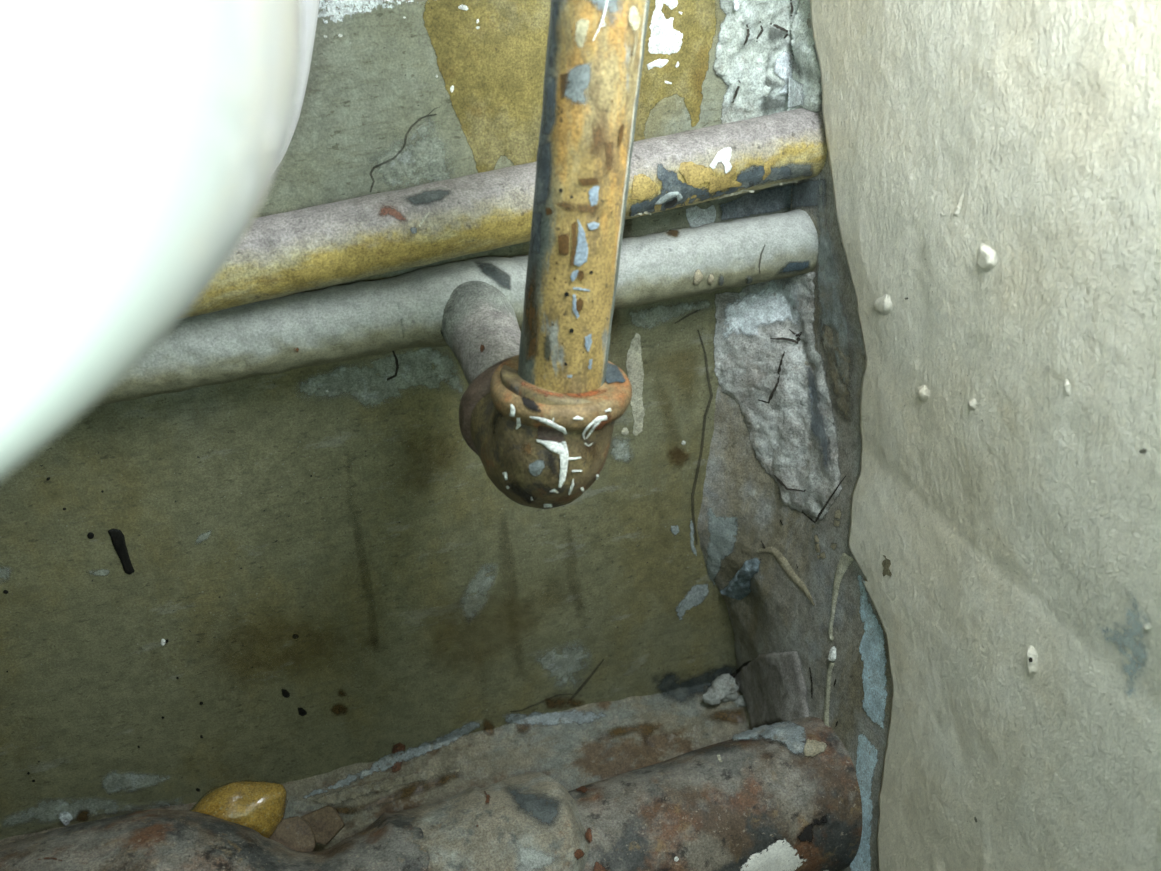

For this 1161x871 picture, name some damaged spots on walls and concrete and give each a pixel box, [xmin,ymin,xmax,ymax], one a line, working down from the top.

flaking render [713,0,822,124]
crack [369,107,439,192]
spalling [630,158,851,523]